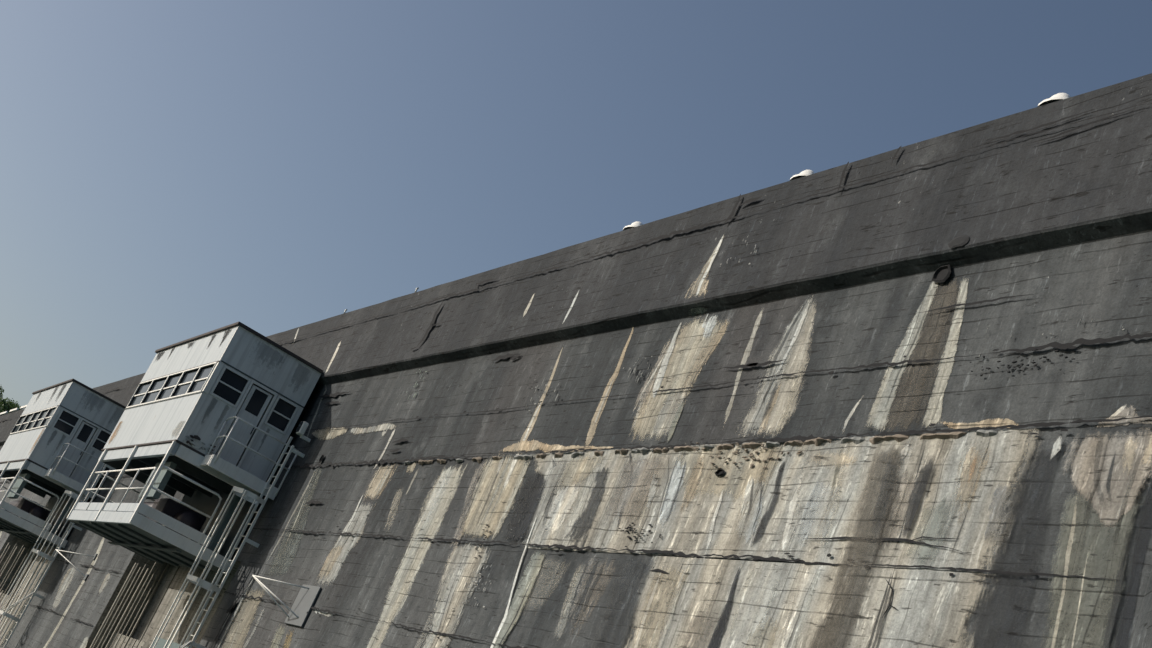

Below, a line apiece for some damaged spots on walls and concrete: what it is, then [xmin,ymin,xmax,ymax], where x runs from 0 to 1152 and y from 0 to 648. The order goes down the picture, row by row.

water stain [305,342,418,584]
water stain [367,236,1152,648]
crack [55,559,117,572]
crack [29,604,93,626]
crack [210,573,528,648]